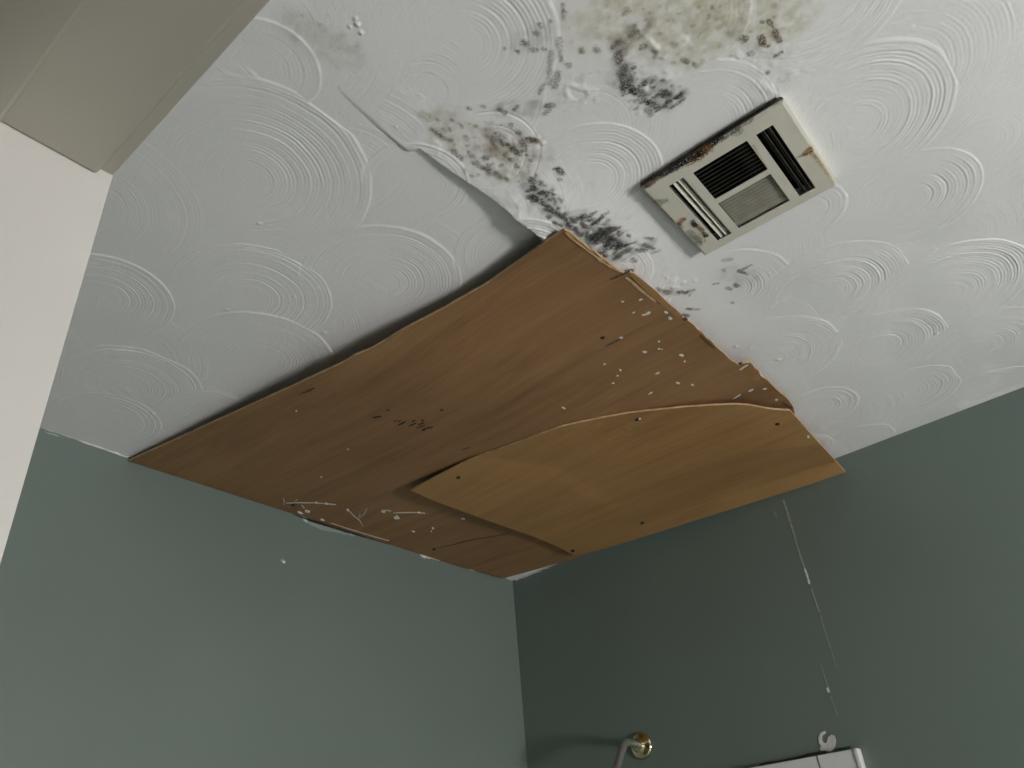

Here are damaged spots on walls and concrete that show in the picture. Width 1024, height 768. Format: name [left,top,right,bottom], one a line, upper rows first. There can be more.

damp [739,19,783,57]
damp [621,81,684,114]
damp [526,177,655,272]
crack [782,500,837,716]